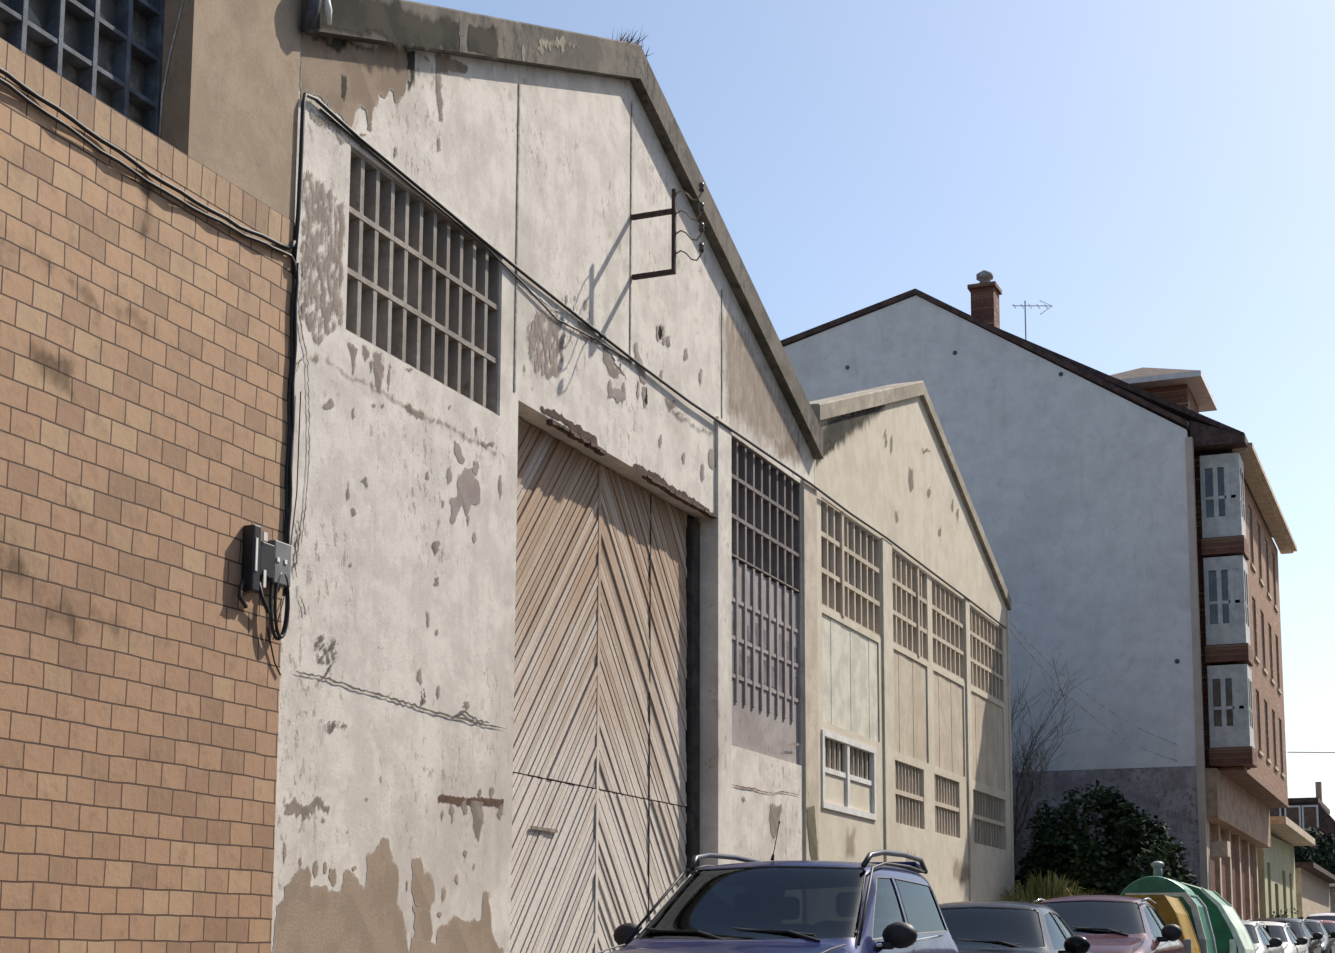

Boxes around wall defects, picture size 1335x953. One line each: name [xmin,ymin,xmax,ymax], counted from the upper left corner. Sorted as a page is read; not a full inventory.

peeling [300,34,409,145]
water stain [312,0,498,121]
peeling [299,170,391,408]
peeling [524,295,663,407]
peeling [657,324,688,361]
spalling [541,406,598,445]
peeling [442,440,481,543]
peeling [315,634,339,664]
crack [295,662,506,729]
spalling [284,796,330,822]
rust [439,787,504,869]
peeling [271,837,504,953]